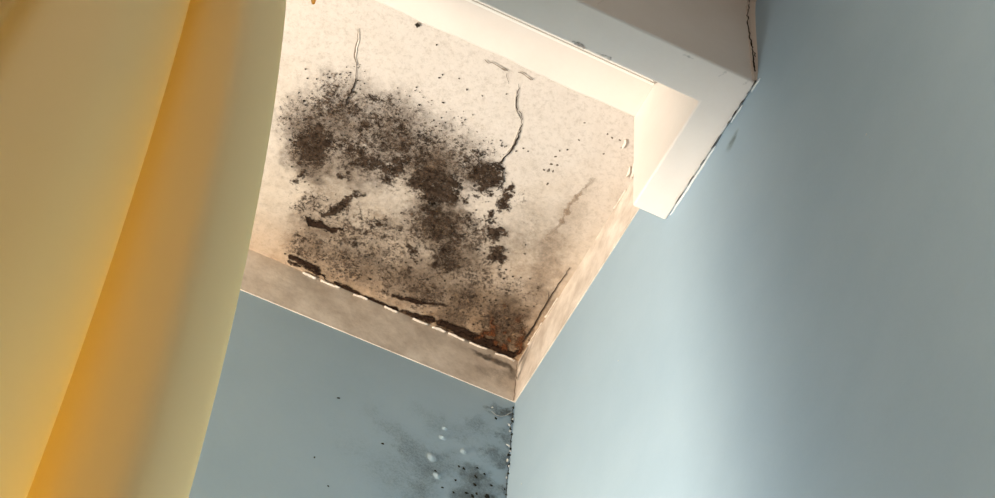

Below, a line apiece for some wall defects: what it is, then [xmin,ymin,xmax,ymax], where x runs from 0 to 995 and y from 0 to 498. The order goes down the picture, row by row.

crack [344,31,360,107]
crack [468,60,533,191]
crack [675,0,757,204]
damp [277,66,539,376]
damp [441,465,505,498]